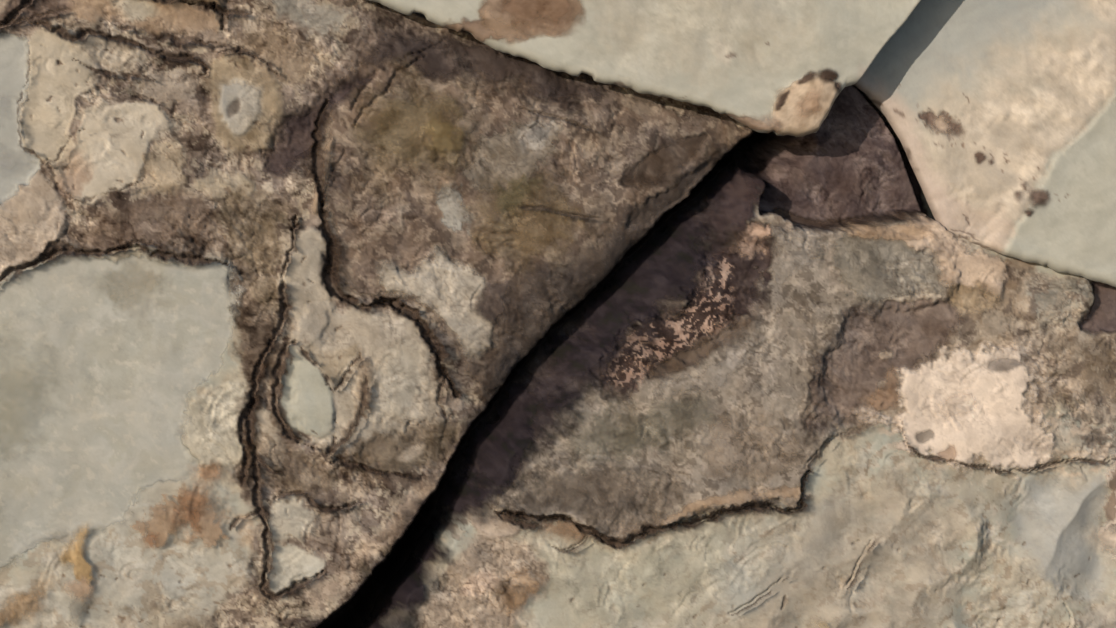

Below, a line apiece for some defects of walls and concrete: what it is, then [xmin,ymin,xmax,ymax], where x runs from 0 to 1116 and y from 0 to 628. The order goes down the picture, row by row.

peeling [0,32,40,204]
peeling [0,254,240,568]
crack [229,100,766,628]
spalling [265,32,1054,541]
spalling [1080,281,1116,333]
peeling [1099,453,1116,535]
crack [733,578,787,615]